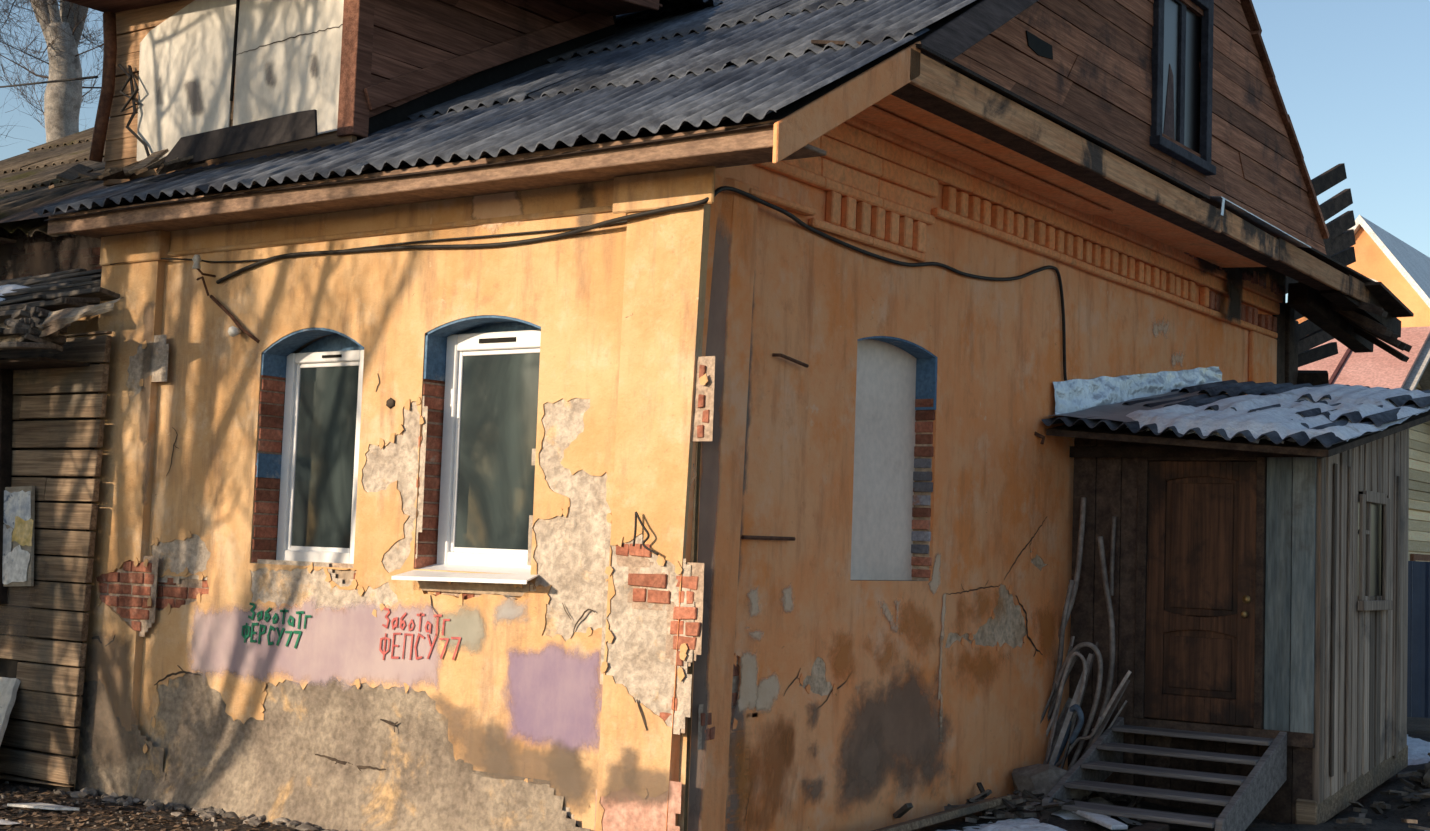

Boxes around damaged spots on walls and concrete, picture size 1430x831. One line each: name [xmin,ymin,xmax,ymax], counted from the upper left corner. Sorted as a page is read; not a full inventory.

water stain [743,343,752,490]
flaking render [251,396,428,617]
flaking render [75,682,166,799]
spalling [96,531,211,637]
spalling [426,582,482,606]
flaking render [506,398,740,750]
water stain [726,703,793,831]
flaking render [799,657,837,696]
water stain [841,594,948,805]
flaking render [945,584,1027,651]